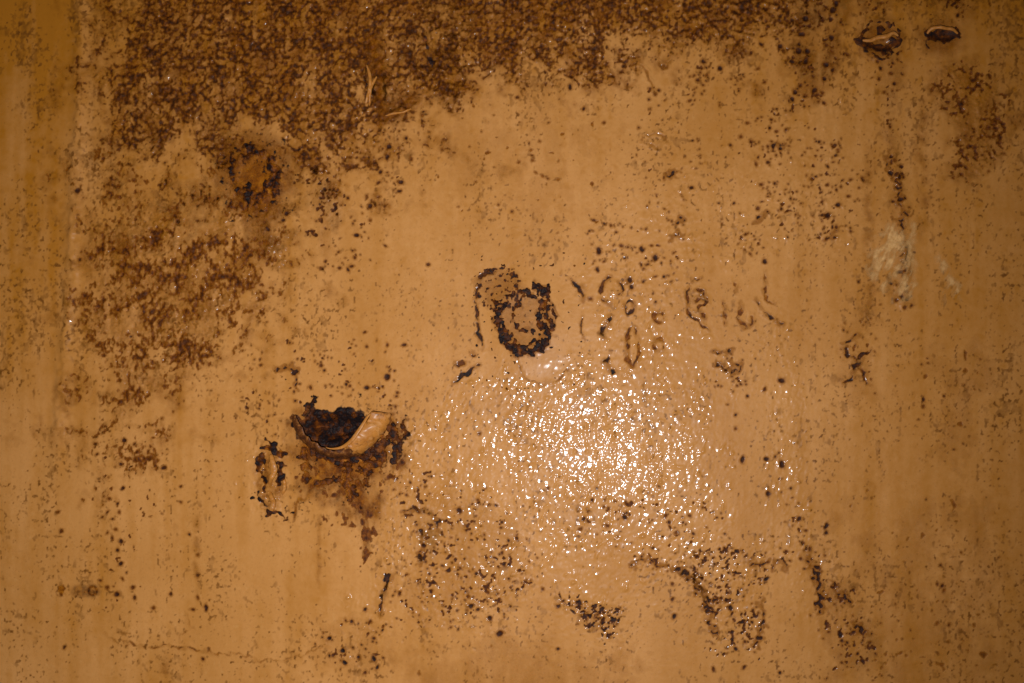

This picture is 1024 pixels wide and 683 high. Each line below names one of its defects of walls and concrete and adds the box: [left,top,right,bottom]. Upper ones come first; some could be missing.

rust [59,367,88,404]
peeling [235,339,623,645]
rust [65,0,822,478]